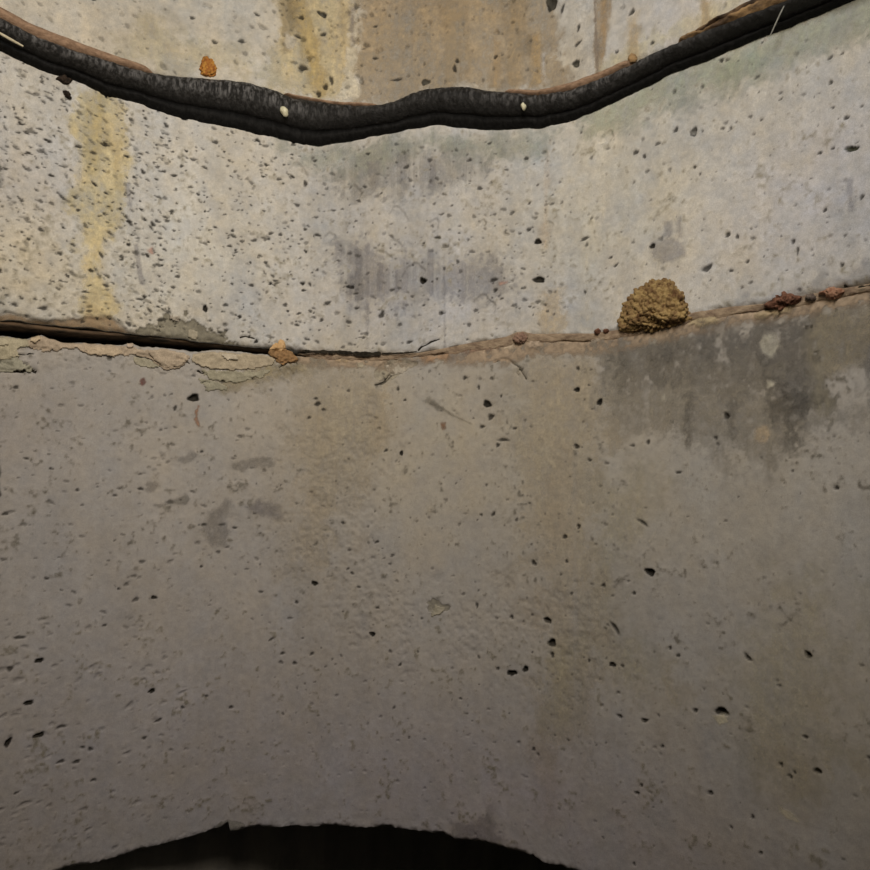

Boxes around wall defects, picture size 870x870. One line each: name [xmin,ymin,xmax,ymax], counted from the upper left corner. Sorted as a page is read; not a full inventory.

water stain [340,47,359,100]
peeling [0,310,275,392]
water stain [599,308,870,462]